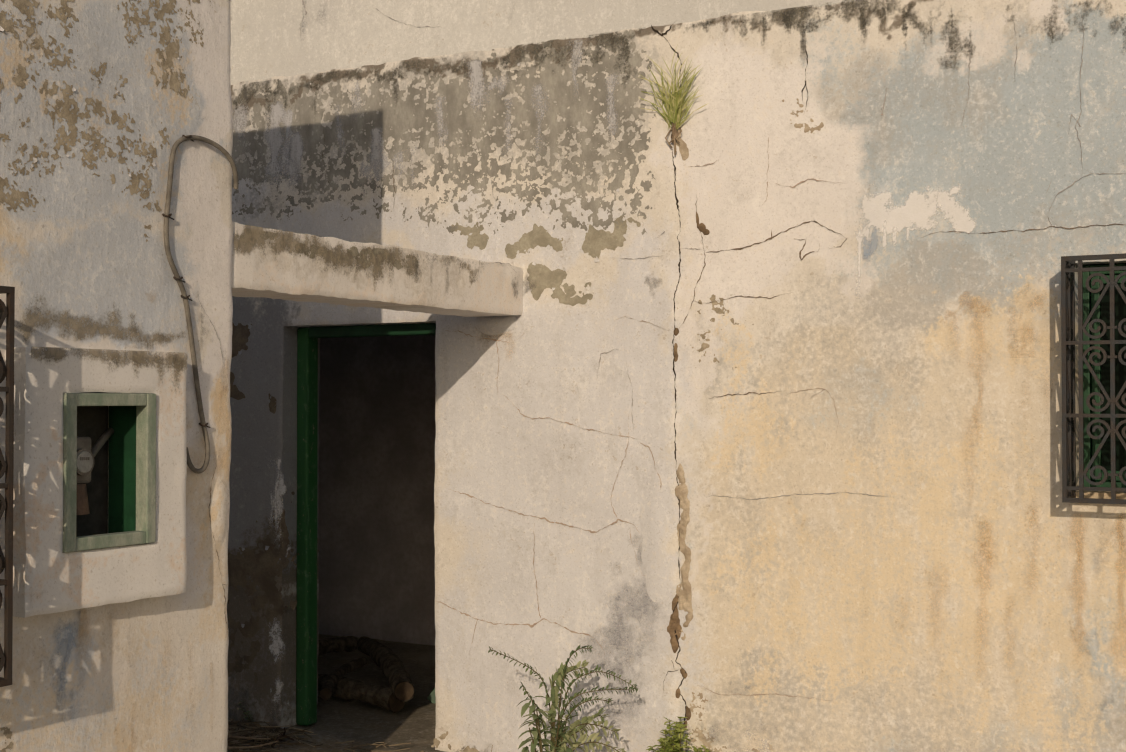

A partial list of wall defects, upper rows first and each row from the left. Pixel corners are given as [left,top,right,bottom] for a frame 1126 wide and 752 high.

peeling [117,0,211,99]
crack [651,22,682,89]
water stain [734,5,818,53]
water stain [829,0,929,35]
water stain [943,16,972,68]
peeling [0,0,170,212]
peeling [232,29,658,306]
peeling [232,322,253,358]
peeling [230,372,246,400]
crack [437,122,847,734]
crack [709,492,888,500]
peeling [227,510,299,684]